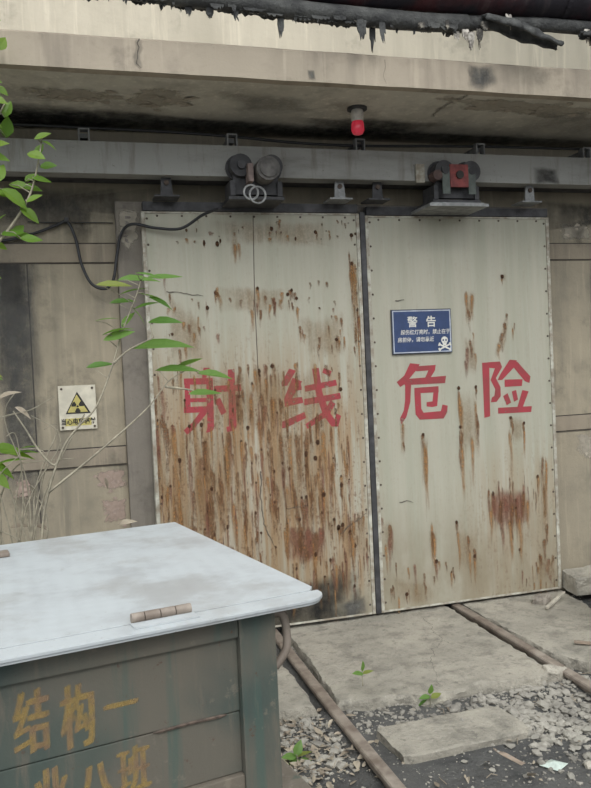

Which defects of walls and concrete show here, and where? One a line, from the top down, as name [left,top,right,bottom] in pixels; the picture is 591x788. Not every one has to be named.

leakage [0,264,34,453]
rust [251,287,299,320]
rust [328,254,361,364]
rust [154,363,370,602]
rust [457,386,479,489]
rust [488,458,547,552]
rust [407,525,455,589]